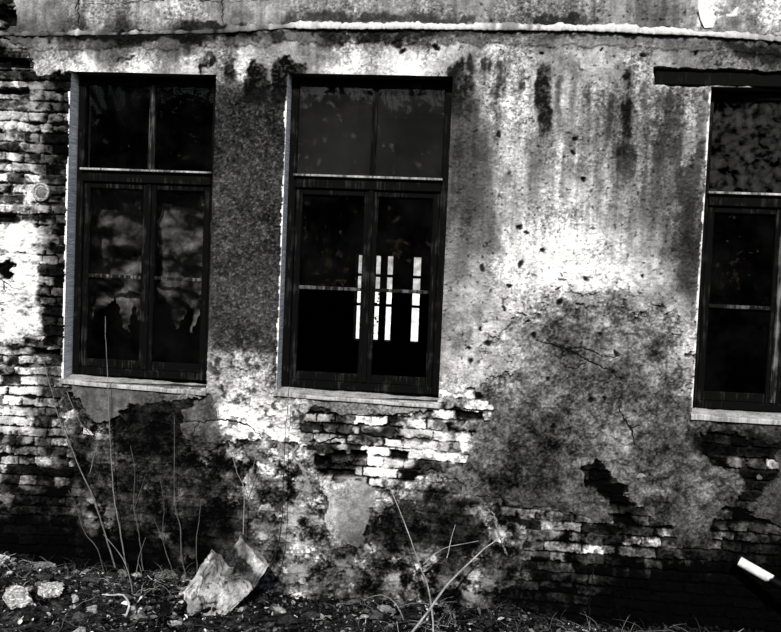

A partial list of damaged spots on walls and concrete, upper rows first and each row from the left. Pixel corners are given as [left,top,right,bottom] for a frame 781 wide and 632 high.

crack [74,0,164,29]
leakage [446,53,505,189]
leakage [519,63,561,136]
leakage [605,69,706,274]
spalling [653,66,781,80]
spalling [0,0,86,569]
spalling [298,274,781,632]